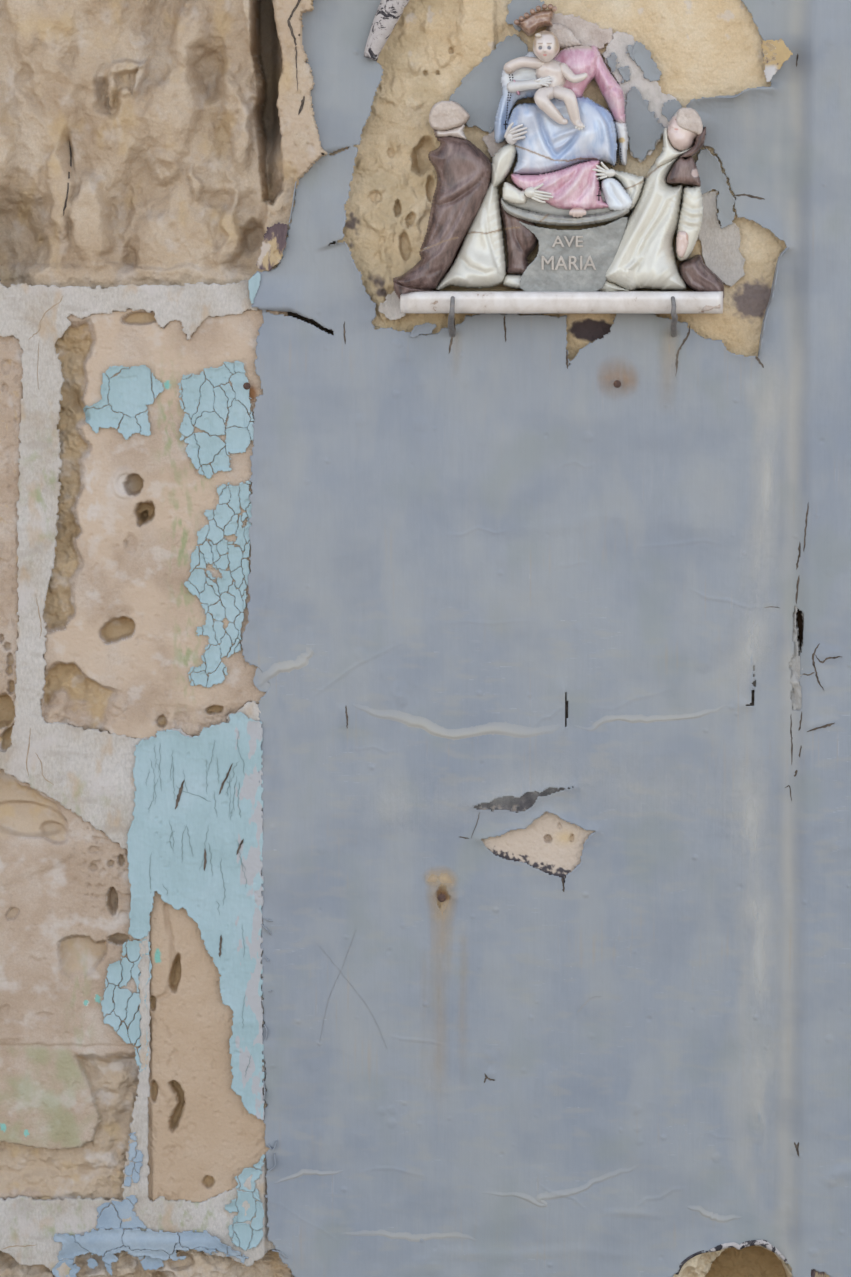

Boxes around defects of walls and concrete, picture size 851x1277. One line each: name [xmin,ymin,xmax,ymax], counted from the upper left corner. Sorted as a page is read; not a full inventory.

spalling [0,0,793,365]
spalling [0,308,294,1277]
peeling [481,811,595,883]
crack [746,665,756,706]
crack [765,506,841,801]
spalling [673,1240,793,1277]